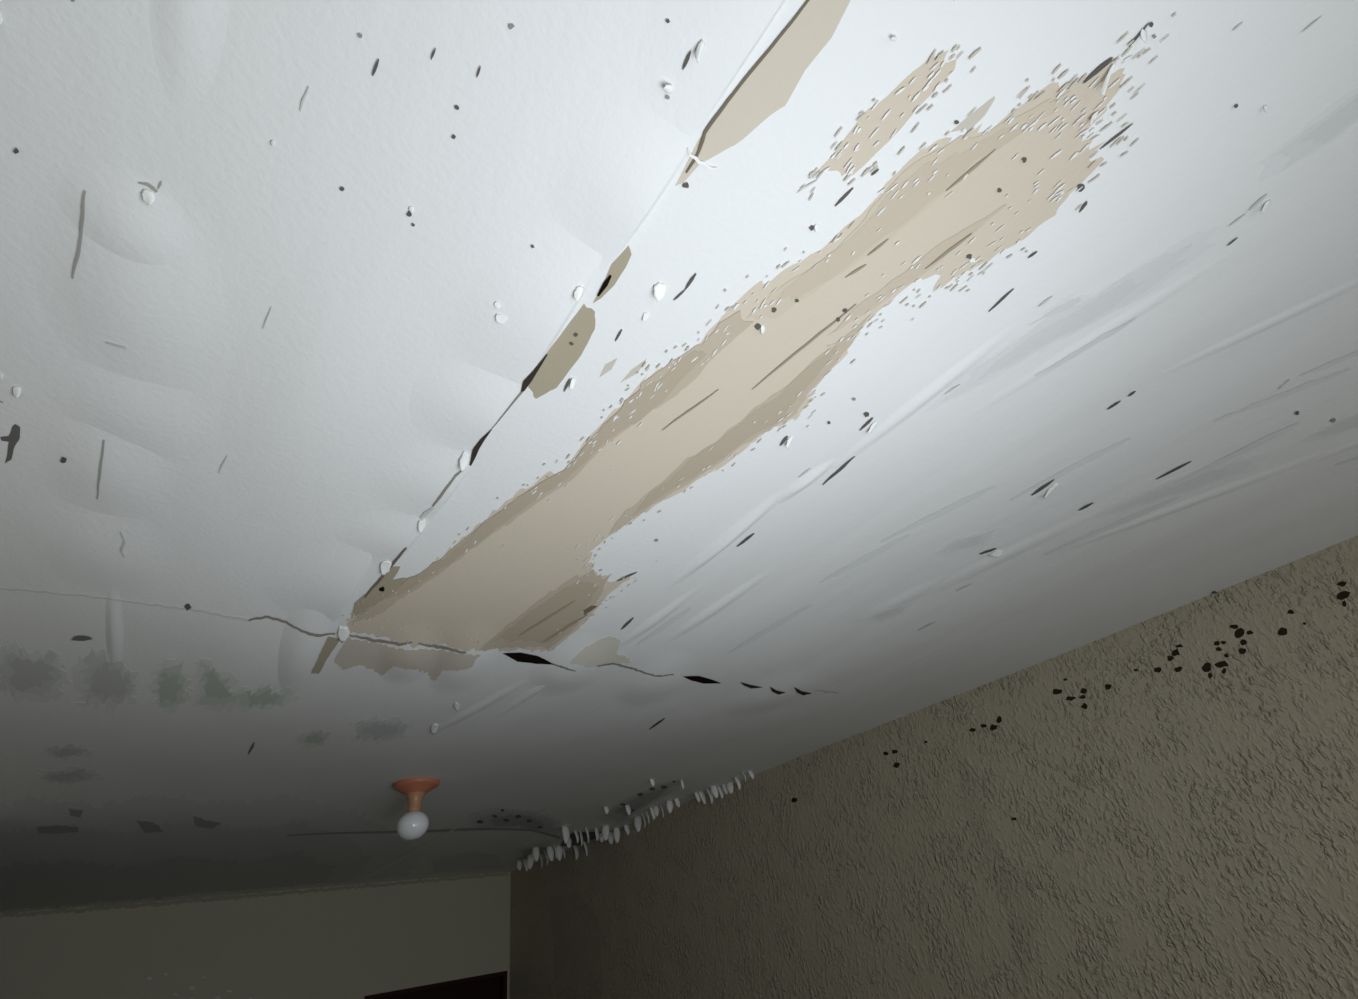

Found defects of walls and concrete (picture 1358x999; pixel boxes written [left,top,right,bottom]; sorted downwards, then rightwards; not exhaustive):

crack [686,0,810,173]
crack [797,169,879,207]
crack [597,275,612,296]
crack [674,274,696,300]
peeling [338,50,1126,652]
crack [493,354,570,428]
crack [799,418,873,485]
mould [0,636,301,714]
damp [1053,678,1088,709]
damp [1154,644,1183,673]
damp [1202,625,1253,679]
damp [0,743,698,918]